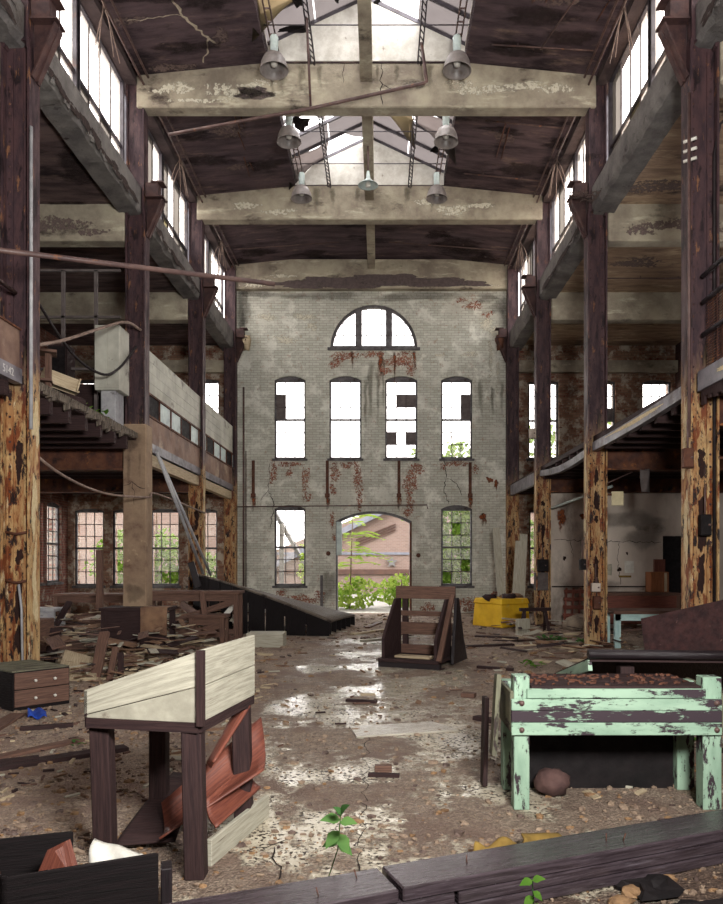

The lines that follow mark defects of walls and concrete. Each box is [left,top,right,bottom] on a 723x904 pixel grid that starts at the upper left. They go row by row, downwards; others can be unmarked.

crack [127,2,216,63]
peeling [234,86,275,100]
peeling [275,273,491,289]
peeling [457,298,493,318]